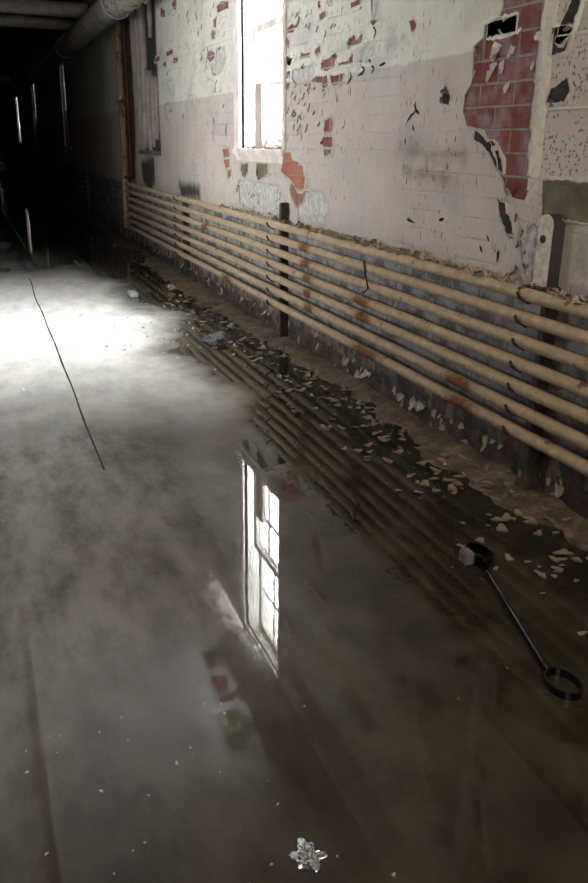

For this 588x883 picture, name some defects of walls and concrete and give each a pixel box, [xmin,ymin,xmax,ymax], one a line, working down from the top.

peeling [154,0,230,93]
peeling [218,0,588,305]